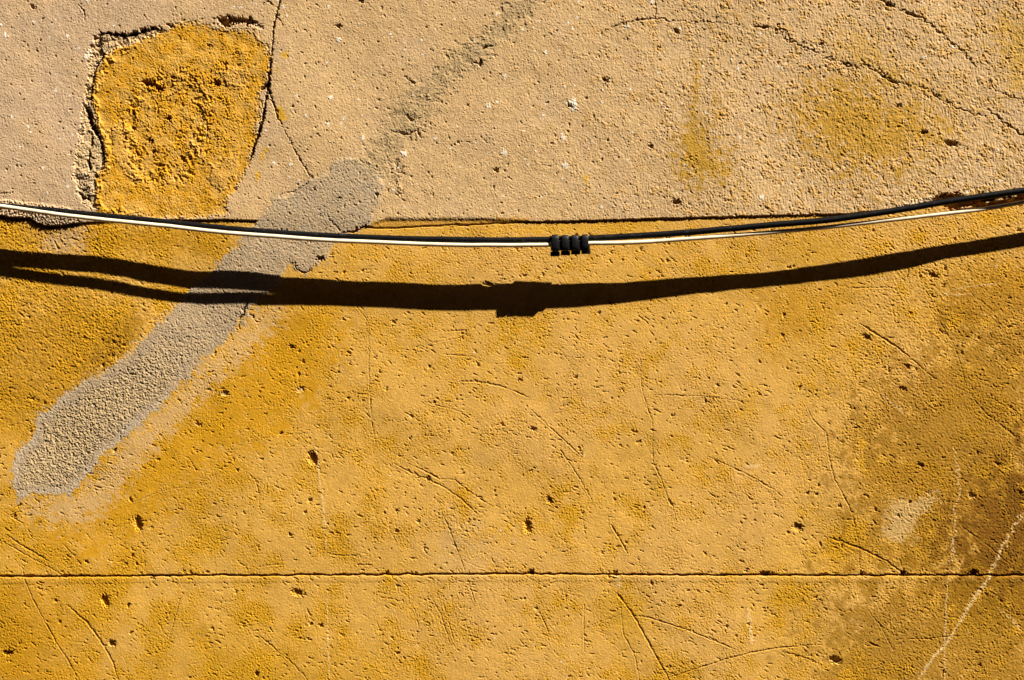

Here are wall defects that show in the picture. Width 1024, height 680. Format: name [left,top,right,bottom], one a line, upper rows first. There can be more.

spalling [70,24,168,211]
peeling [178,136,243,195]
peeling [212,61,250,91]
spalling [206,13,265,48]
crack [248,0,314,199]
crack [599,0,1024,166]